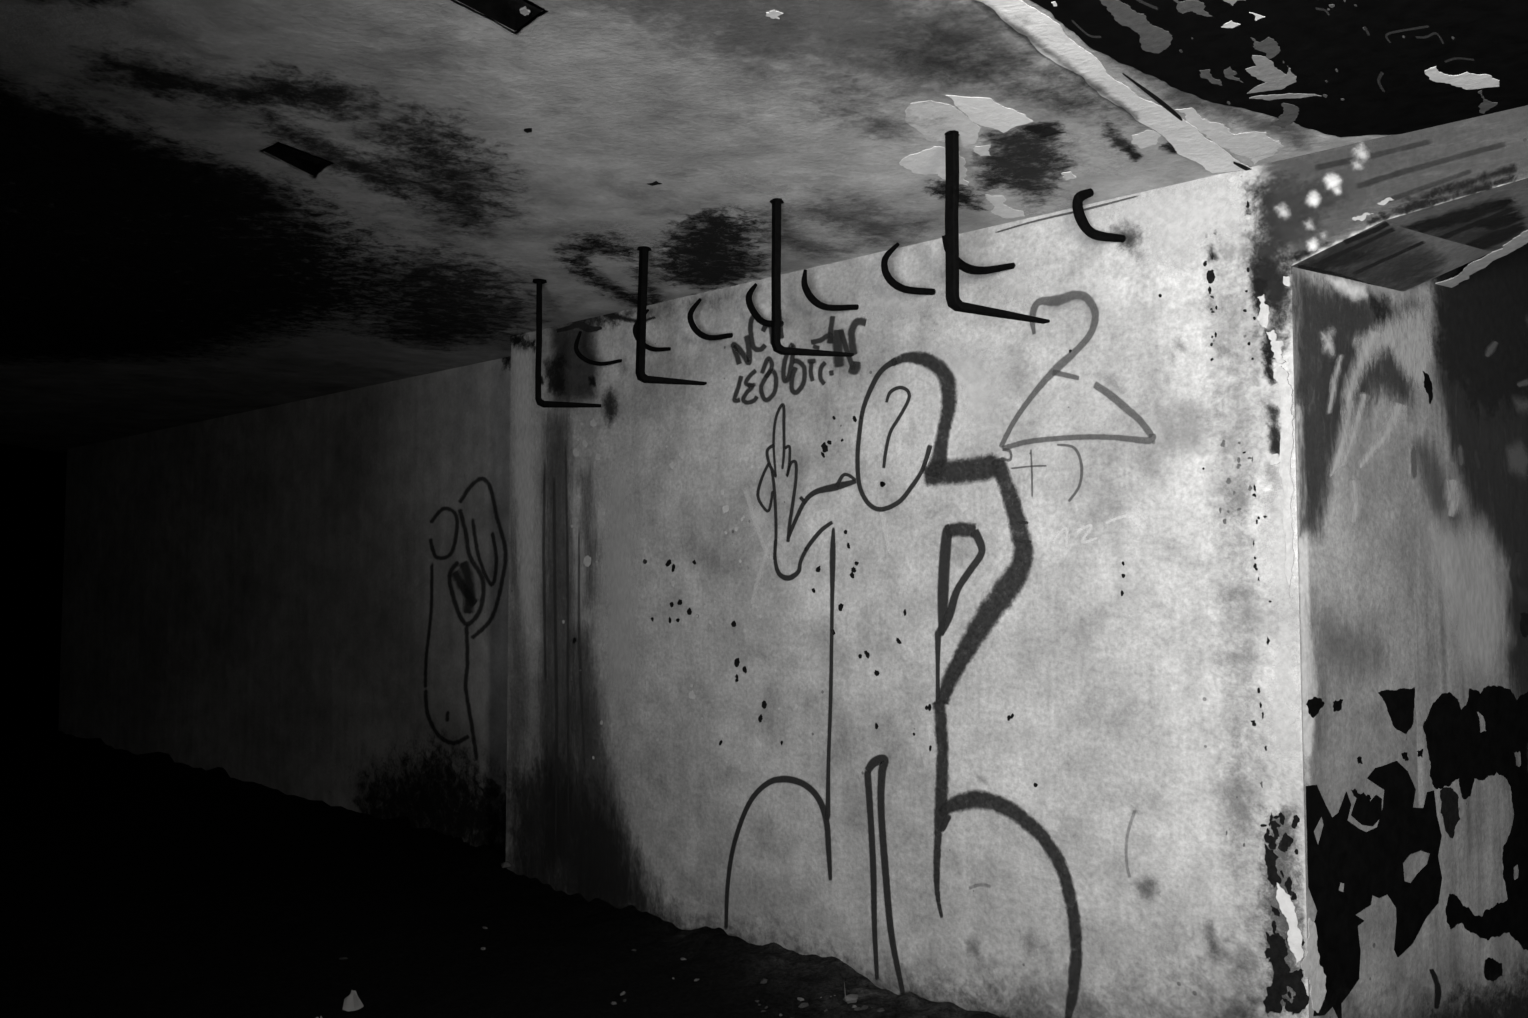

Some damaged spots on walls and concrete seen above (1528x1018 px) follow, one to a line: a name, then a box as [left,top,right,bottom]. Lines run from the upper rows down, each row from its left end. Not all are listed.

peeling [1030,0,1528,165]
peeling [1260,685,1528,1018]